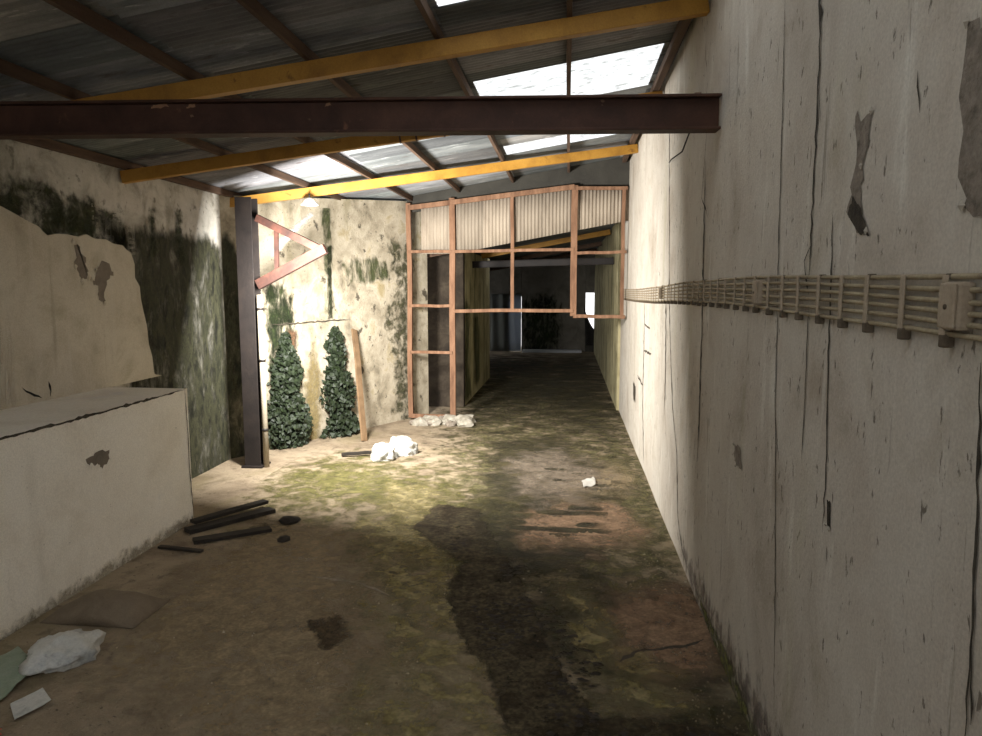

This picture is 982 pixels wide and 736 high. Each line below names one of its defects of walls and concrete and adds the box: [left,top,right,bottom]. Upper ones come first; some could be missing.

flaking render [71,238,114,306]
water stain [0,176,245,479]
water stain [271,214,313,256]
water stain [384,239,416,420]
spalling [846,107,873,236]
spalling [957,17,982,217]
spalling [86,450,111,469]
water stain [305,354,320,440]